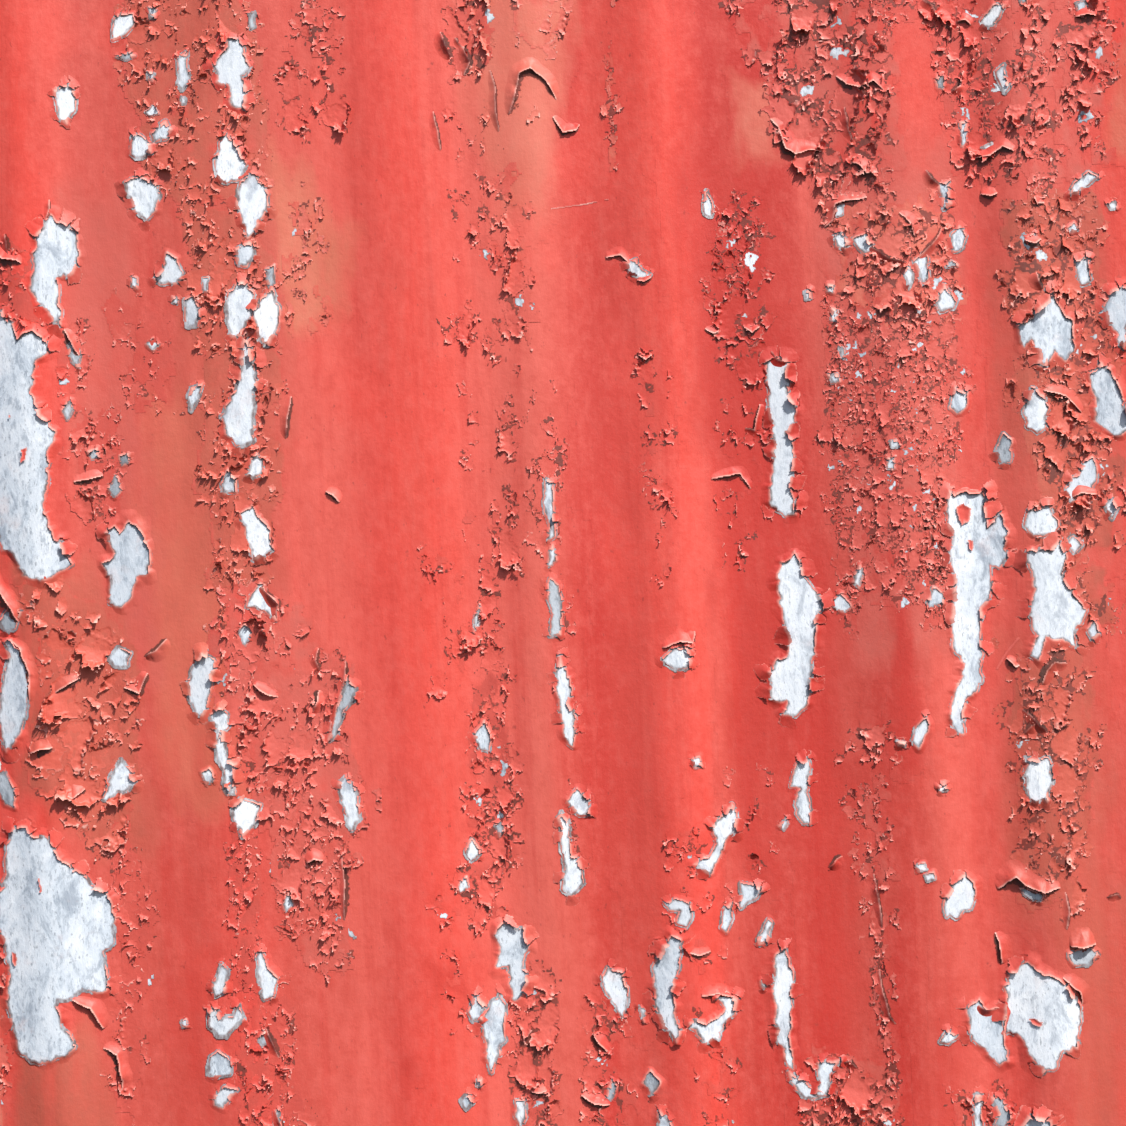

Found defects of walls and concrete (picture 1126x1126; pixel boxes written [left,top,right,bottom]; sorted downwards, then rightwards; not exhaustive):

peeling [436,105,541,377]
peeling [504,0,574,115]
peeling [527,105,580,136]
peeling [0,0,382,1126]
peeling [578,0,1126,1126]
peeling [552,778,598,906]